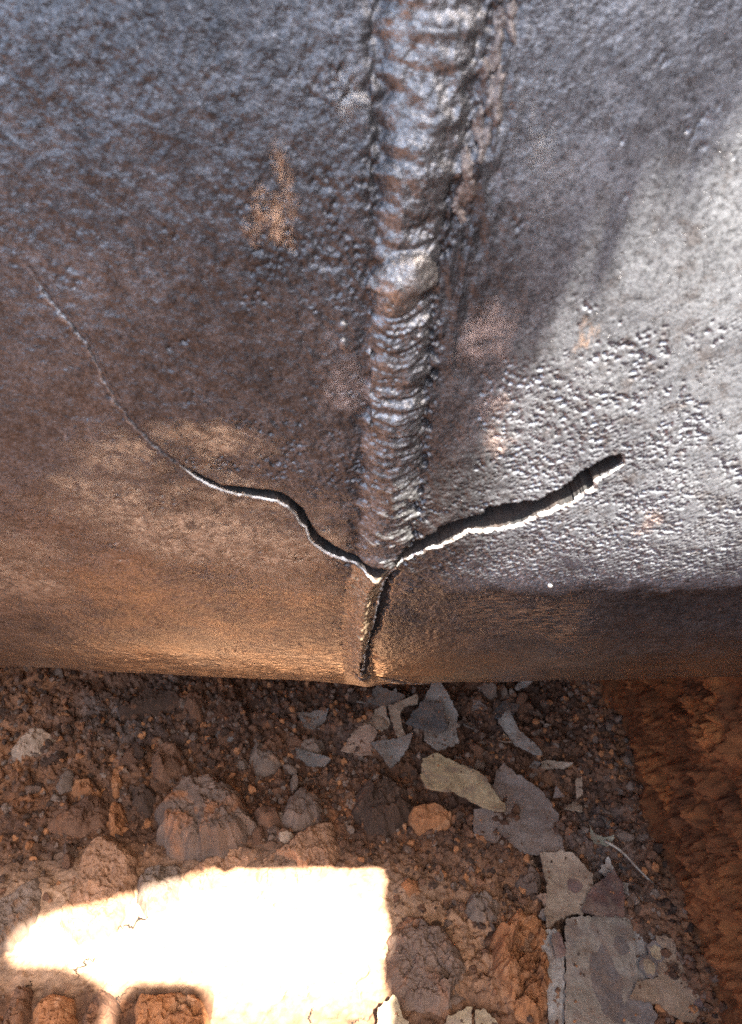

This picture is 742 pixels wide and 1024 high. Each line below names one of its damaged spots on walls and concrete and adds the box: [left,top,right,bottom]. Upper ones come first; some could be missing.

rust [257,207,291,246]
crack [25,267,627,685]